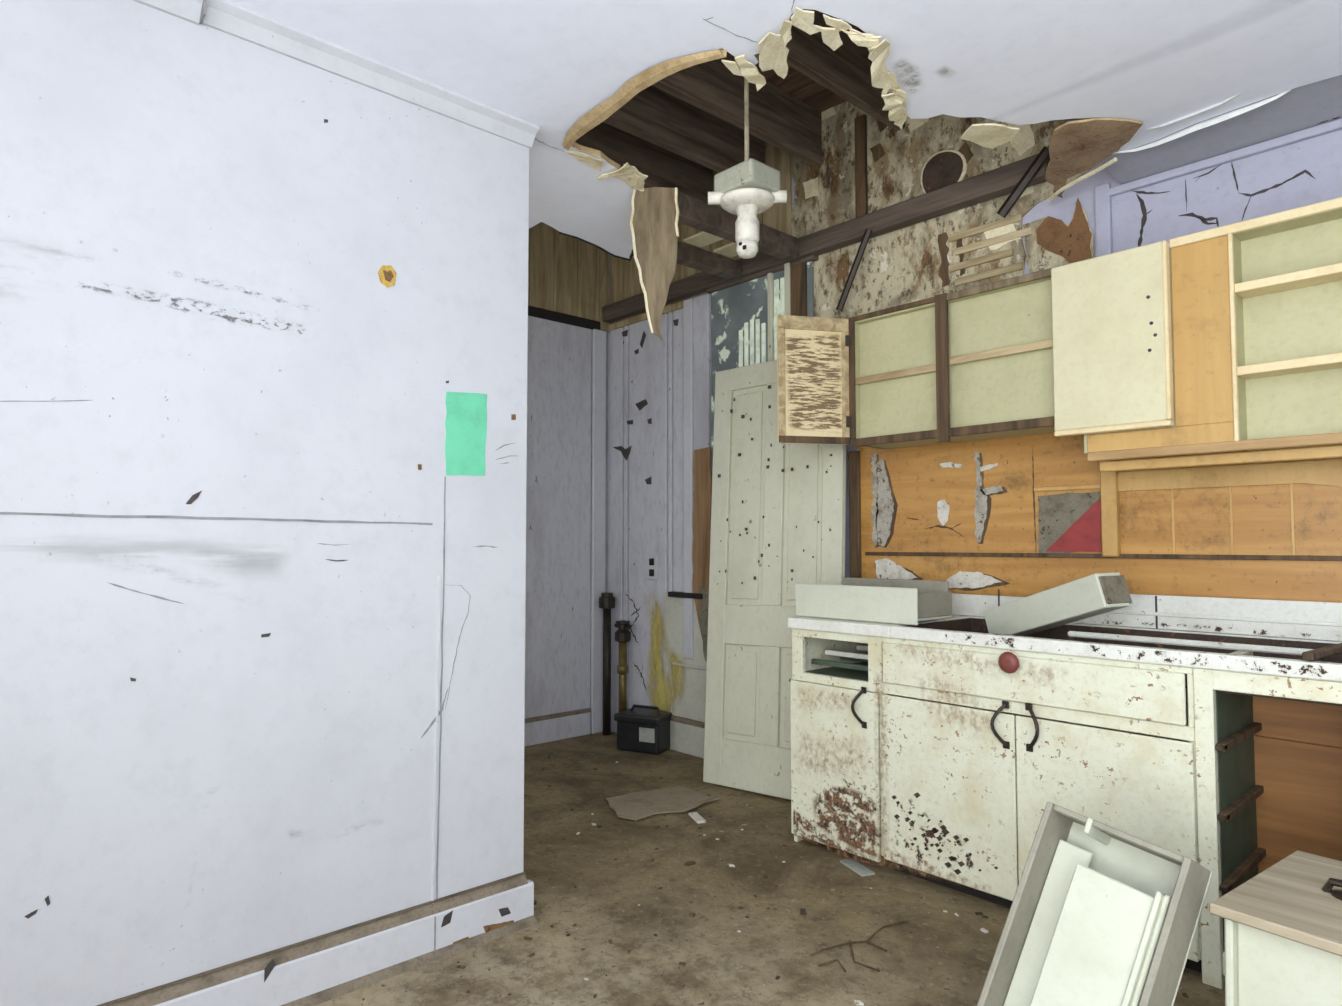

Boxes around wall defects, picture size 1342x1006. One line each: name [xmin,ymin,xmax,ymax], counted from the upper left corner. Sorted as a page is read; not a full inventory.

flaking render [721,6,1064,238]
peeling [566,150,648,191]
flaking render [790,166,1094,319]
crack [1133,163,1316,247]
peeling [871,453,923,580]
peeling [937,499,950,526]
peeling [940,452,1007,544]